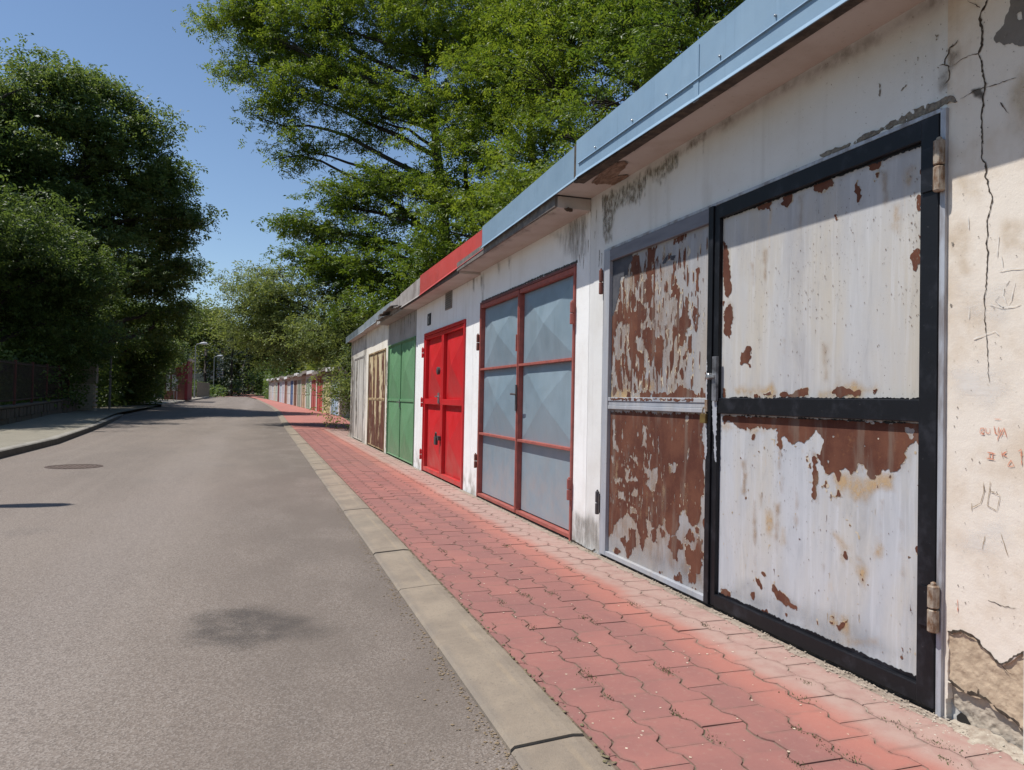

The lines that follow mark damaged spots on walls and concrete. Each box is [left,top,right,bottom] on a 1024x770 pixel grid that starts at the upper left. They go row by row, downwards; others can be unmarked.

peeling [994,0,1024,52]
damp [569,154,678,263]
peeling [820,143,851,157]
corrosion [903,194,921,277]
crack [941,0,1013,383]
corrosion [722,241,733,338]
corrosion [608,234,708,590]
corrosion [740,346,752,368]
corrosion [831,386,878,398]
corrosion [722,415,919,540]
corrosion [745,564,803,617]
spalling [949,631,1024,751]